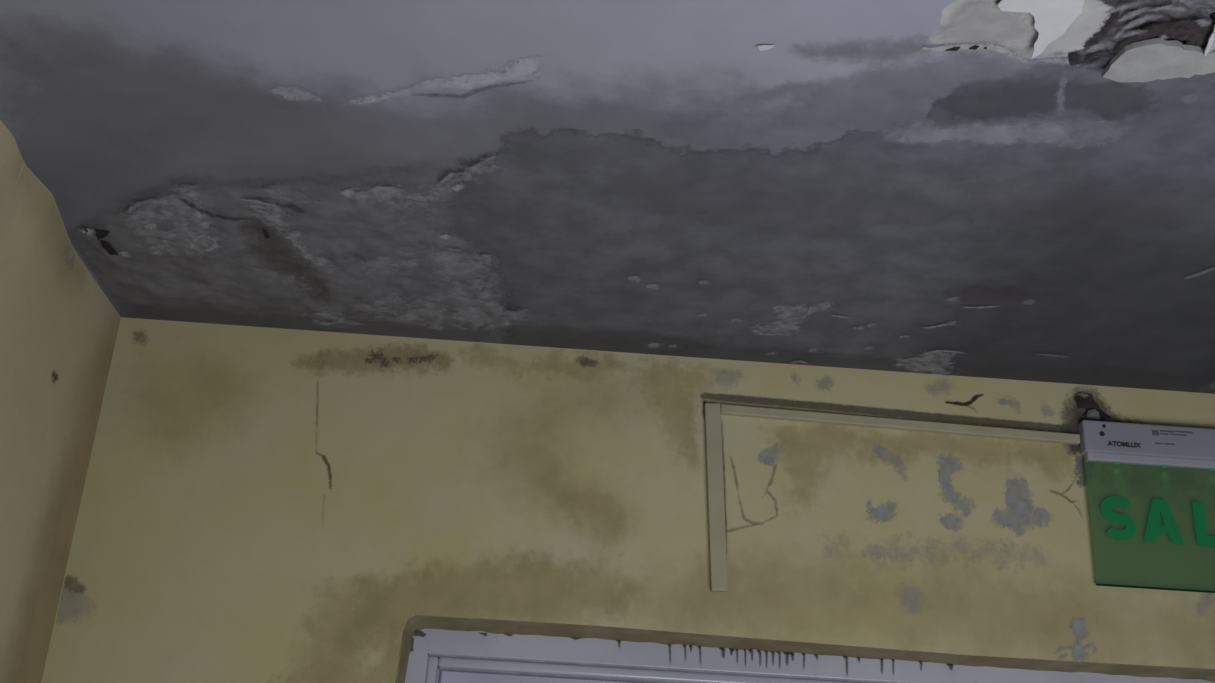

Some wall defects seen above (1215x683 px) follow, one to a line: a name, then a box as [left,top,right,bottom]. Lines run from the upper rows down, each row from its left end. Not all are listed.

spalling [923,0,1215,82]
peeling [350,57,542,105]
water stain [28,54,1215,394]
crack [946,394,982,406]
crack [319,454,331,487]
peeling [938,457,971,531]
peeling [996,478,1049,535]
water stain [296,575,472,683]